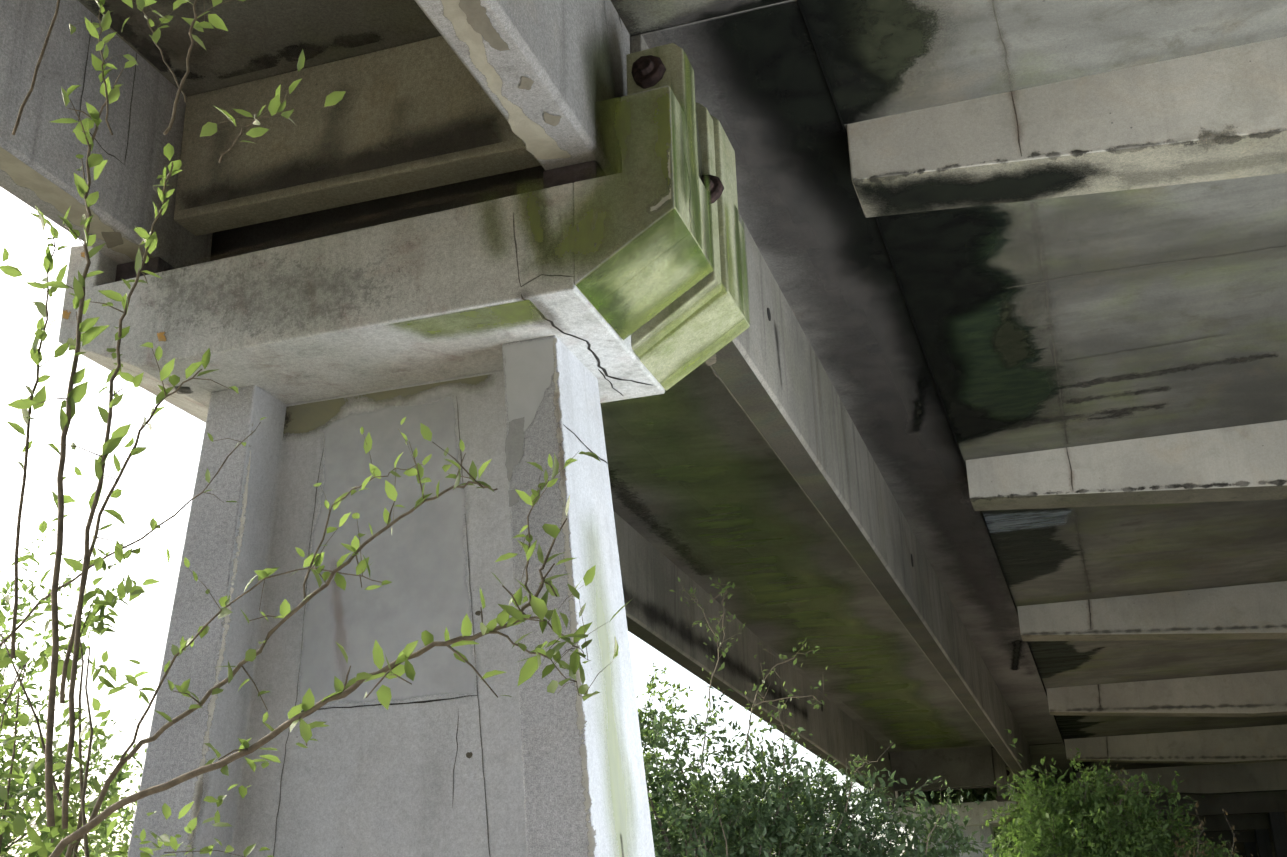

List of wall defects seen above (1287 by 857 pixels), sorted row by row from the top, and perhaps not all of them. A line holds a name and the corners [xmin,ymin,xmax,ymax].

damp [92,3,202,79]
damp [218,34,380,79]
peeling [441,0,571,160]
crack [992,0,1022,157]
spalling [851,164,960,184]
spalling [1106,129,1287,153]
crack [513,212,650,396]
damp [609,0,1277,678]
crack [563,424,609,465]
spalling [966,491,1058,502]
spalling [1076,482,1249,493]
damp [623,587,807,718]